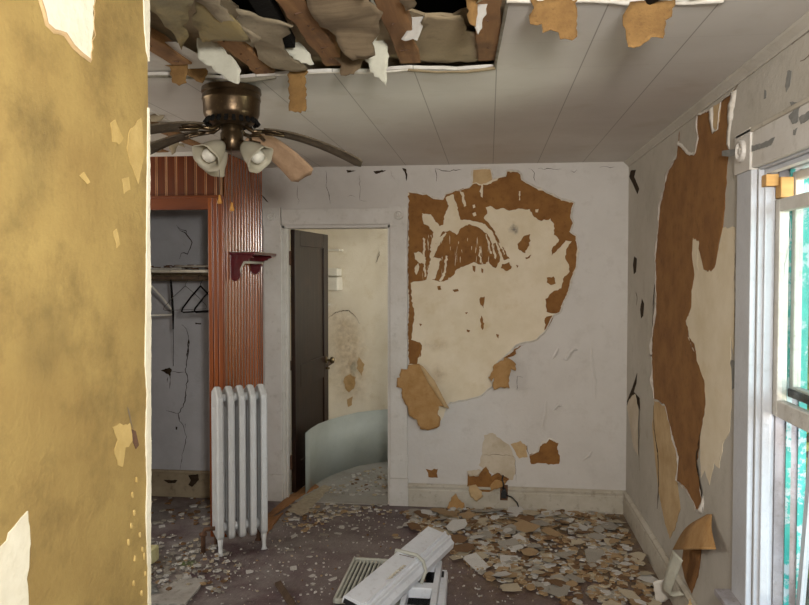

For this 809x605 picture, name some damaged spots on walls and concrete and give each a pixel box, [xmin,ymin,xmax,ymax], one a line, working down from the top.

peeling [38,0,96,63]
spalling [143,0,171,72]
peeling [165,42,219,75]
spalling [110,108,168,605]
crack [164,323,201,487]
peeling [396,364,449,430]
peeling [488,358,516,390]
flaking render [686,226,736,485]
peeling [527,438,560,465]
peeling [447,467,509,510]
peeling [0,511,31,605]